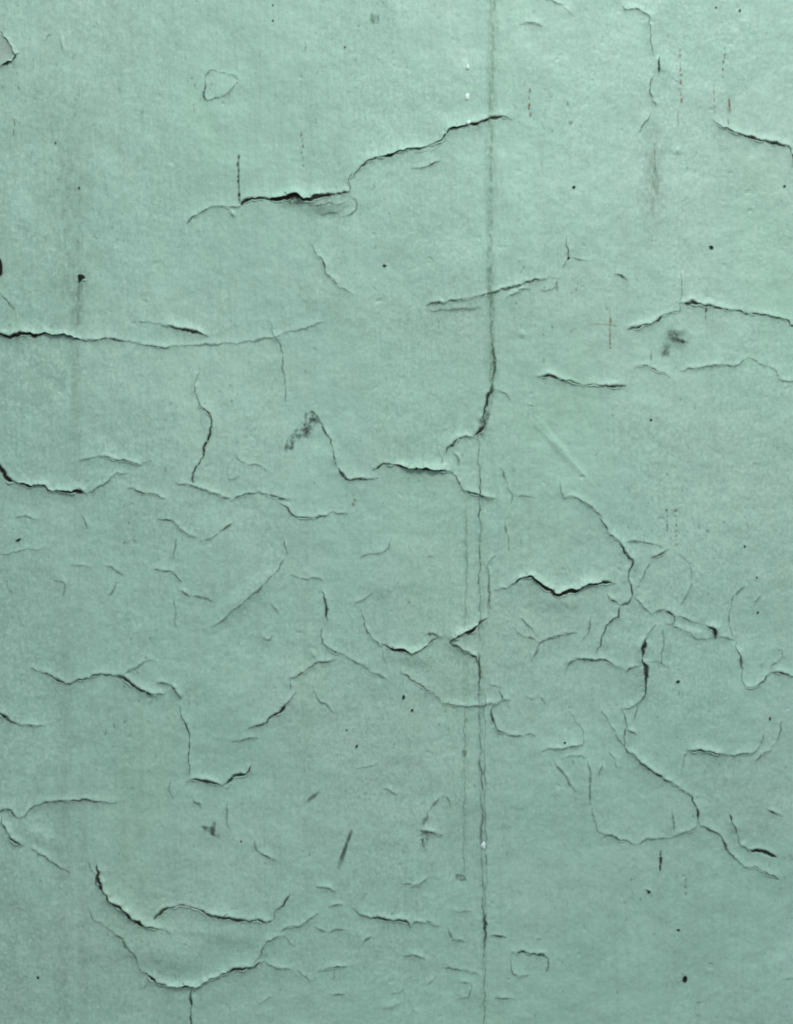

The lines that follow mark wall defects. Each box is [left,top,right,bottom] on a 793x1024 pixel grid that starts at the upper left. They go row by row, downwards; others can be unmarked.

crack [0,296,793,1024]